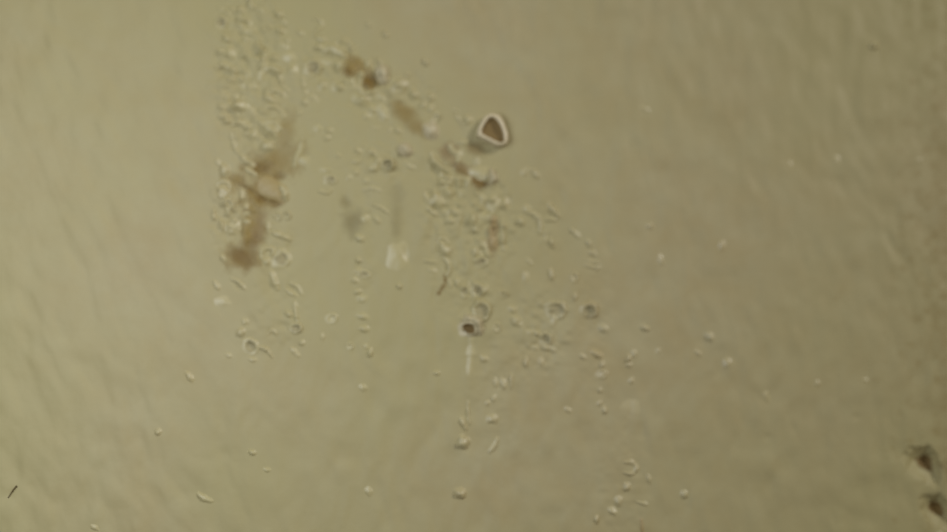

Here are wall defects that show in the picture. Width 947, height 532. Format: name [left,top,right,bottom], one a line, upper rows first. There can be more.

peeling [898,444,947,532]